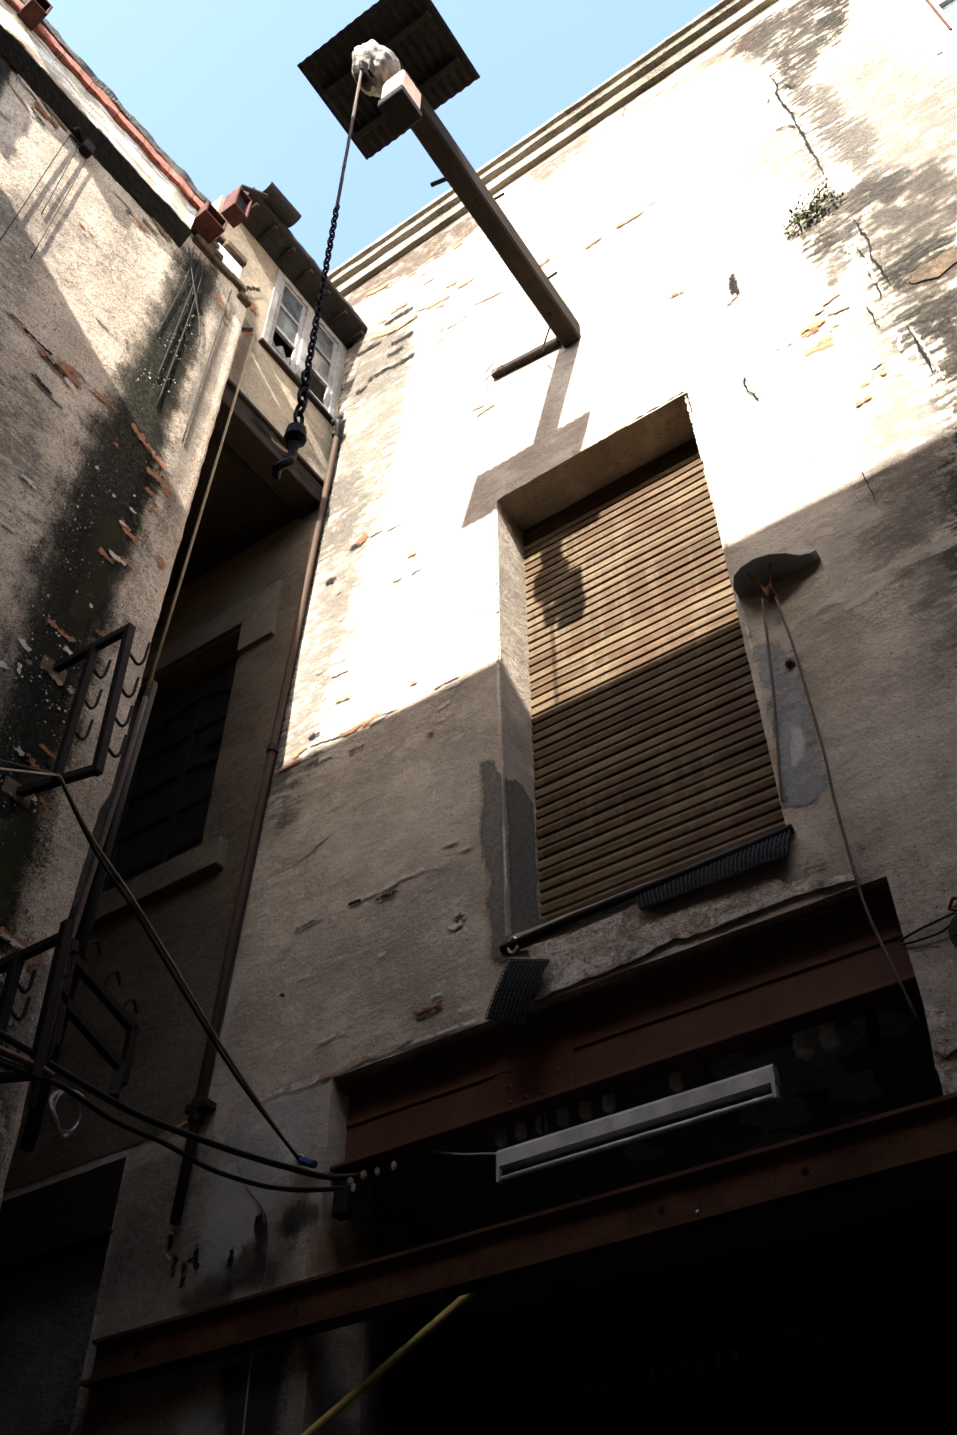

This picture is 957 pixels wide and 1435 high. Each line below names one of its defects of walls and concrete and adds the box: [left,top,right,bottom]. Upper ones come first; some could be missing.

water stain [0,56,14,99]
crack [765,74,825,175]
spalling [12,314,120,412]
water stain [347,213,478,308]
spalling [355,261,473,395]
water stain [529,0,957,620]
spalling [775,288,849,356]
spalling [119,423,173,543]
spalling [98,547,133,568]
spalling [45,618,76,655]
water stain [0,246,221,1126]
peeling [519,860,855,1003]